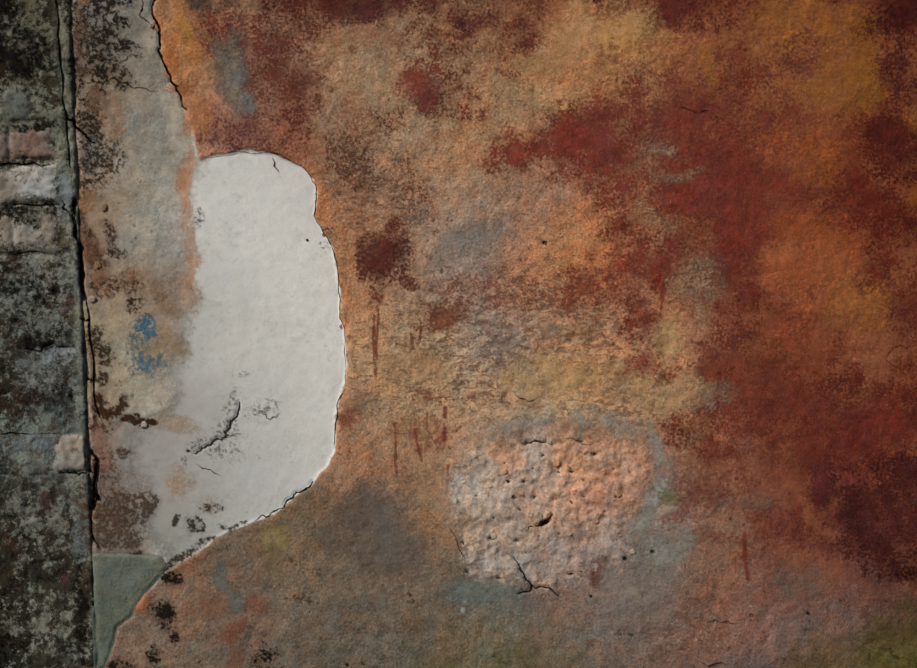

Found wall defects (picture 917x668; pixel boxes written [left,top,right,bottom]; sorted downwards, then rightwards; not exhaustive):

crack [0,0,91,171]
crack [13,199,99,416]
damp [0,0,204,318]
crack [86,0,186,109]
damp [0,323,273,456]
damp [161,501,247,589]
peeling [51,0,553,561]
rust [355,217,420,374]
rust [409,406,447,461]
rust [410,299,467,350]
flaking render [443,418,655,595]
peeling [431,0,917,403]